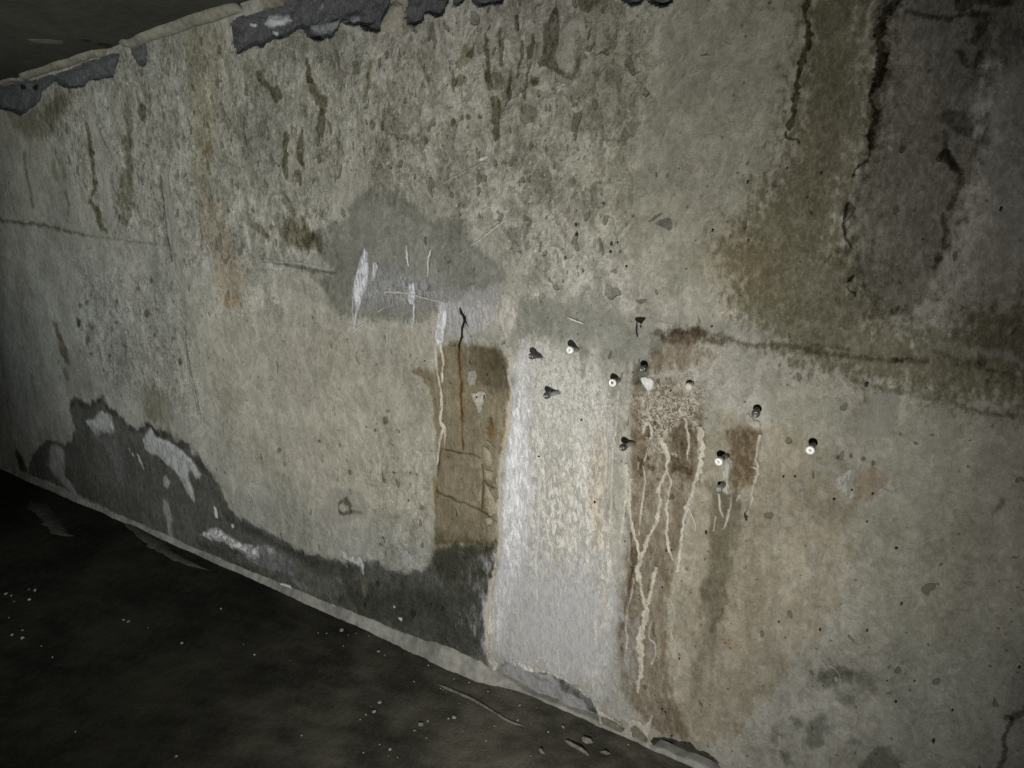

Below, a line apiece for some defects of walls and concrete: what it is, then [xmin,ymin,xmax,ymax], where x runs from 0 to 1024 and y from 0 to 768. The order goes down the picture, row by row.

spalling [230,0,504,54]
spalling [621,0,673,8]
spalling [0,43,148,116]
crack [785,2,813,143]
crack [852,0,901,176]
crack [458,308,469,349]
leakage [352,246,706,735]
leakage [715,435,761,527]
leakage [203,506,272,558]
leakage [341,550,364,574]